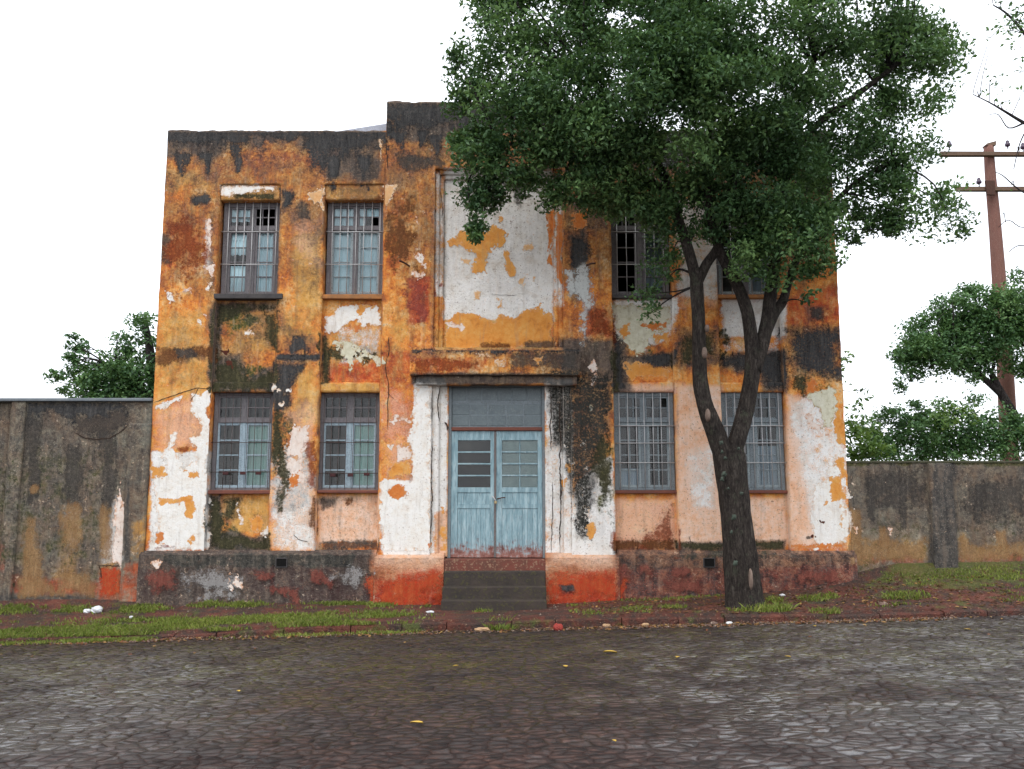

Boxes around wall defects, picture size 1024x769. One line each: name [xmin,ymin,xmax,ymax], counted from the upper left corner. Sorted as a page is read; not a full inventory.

damp [167,103,525,191]
damp [23,403,128,568]
peeling [146,388,212,595]
damp [203,496,271,551]
damp [156,299,383,474]
peeling [324,304,386,372]
peeling [321,385,447,551]
peeling [444,216,556,351]
damp [412,236,692,543]
peeling [611,303,675,381]
damp [762,307,842,398]
peeling [785,378,855,551]